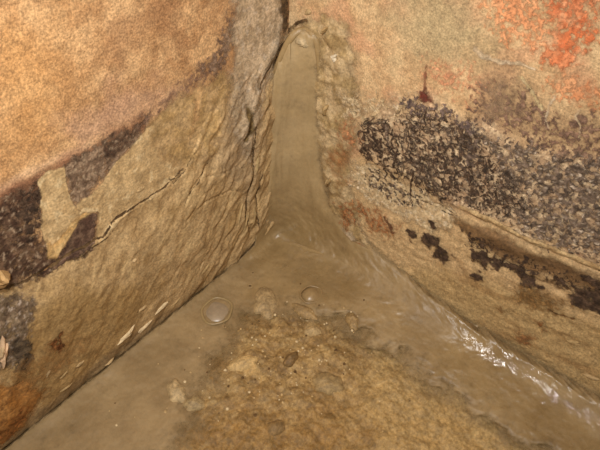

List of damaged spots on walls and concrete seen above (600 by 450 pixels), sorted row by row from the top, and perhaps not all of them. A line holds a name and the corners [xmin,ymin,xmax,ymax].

corrosion [419,67,432,103]
crack [0,159,191,290]
water stain [336,76,600,315]